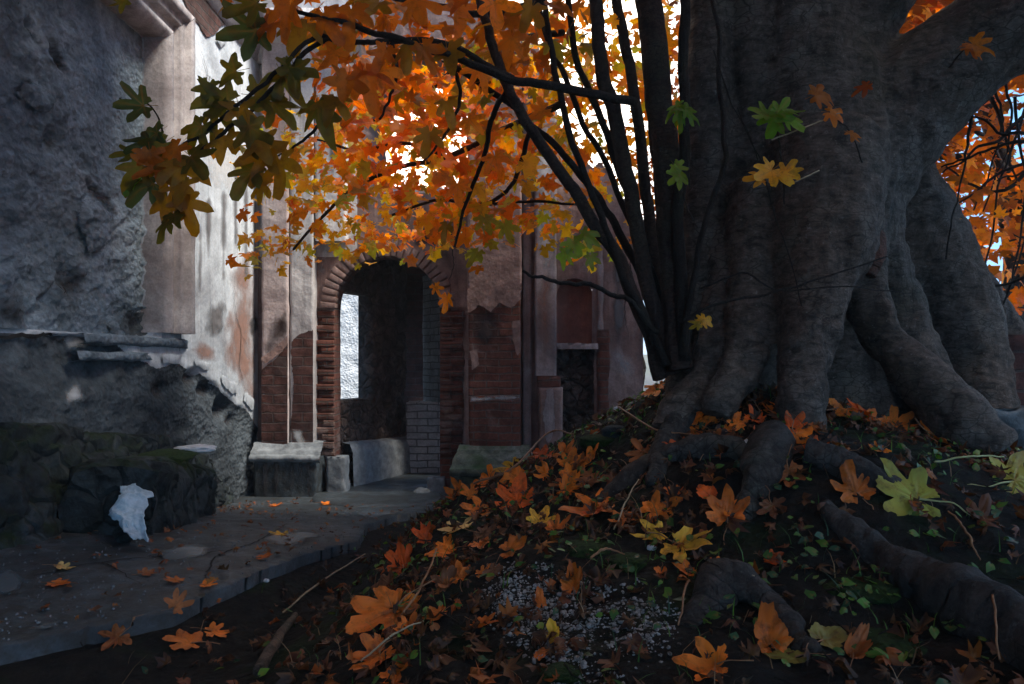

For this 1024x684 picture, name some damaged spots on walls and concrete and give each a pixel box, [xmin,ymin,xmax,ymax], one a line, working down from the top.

damp [196,118,256,275]
flaking render [467,283,522,312]
flaking render [162,354,203,394]
flaking render [195,358,212,371]
flaking render [261,337,287,363]
flaking render [222,375,254,410]